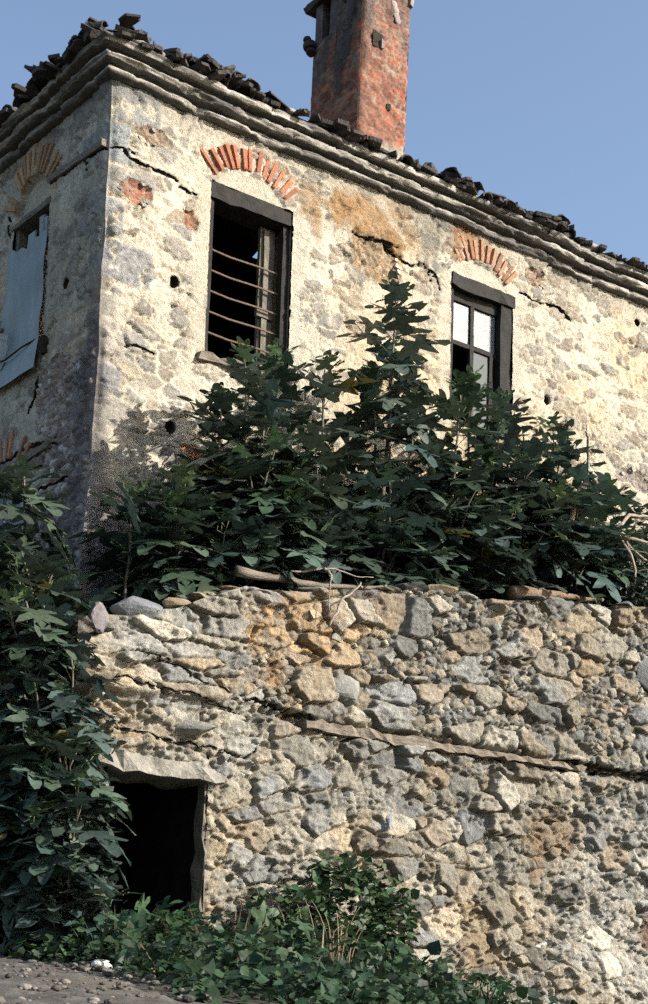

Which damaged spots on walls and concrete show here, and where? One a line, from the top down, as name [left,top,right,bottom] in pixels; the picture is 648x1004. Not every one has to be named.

crack [51,146,197,196]
crack [351,232,441,291]
crack [519,292,570,321]
leakage [45,312,128,589]
crack [551,759,648,780]